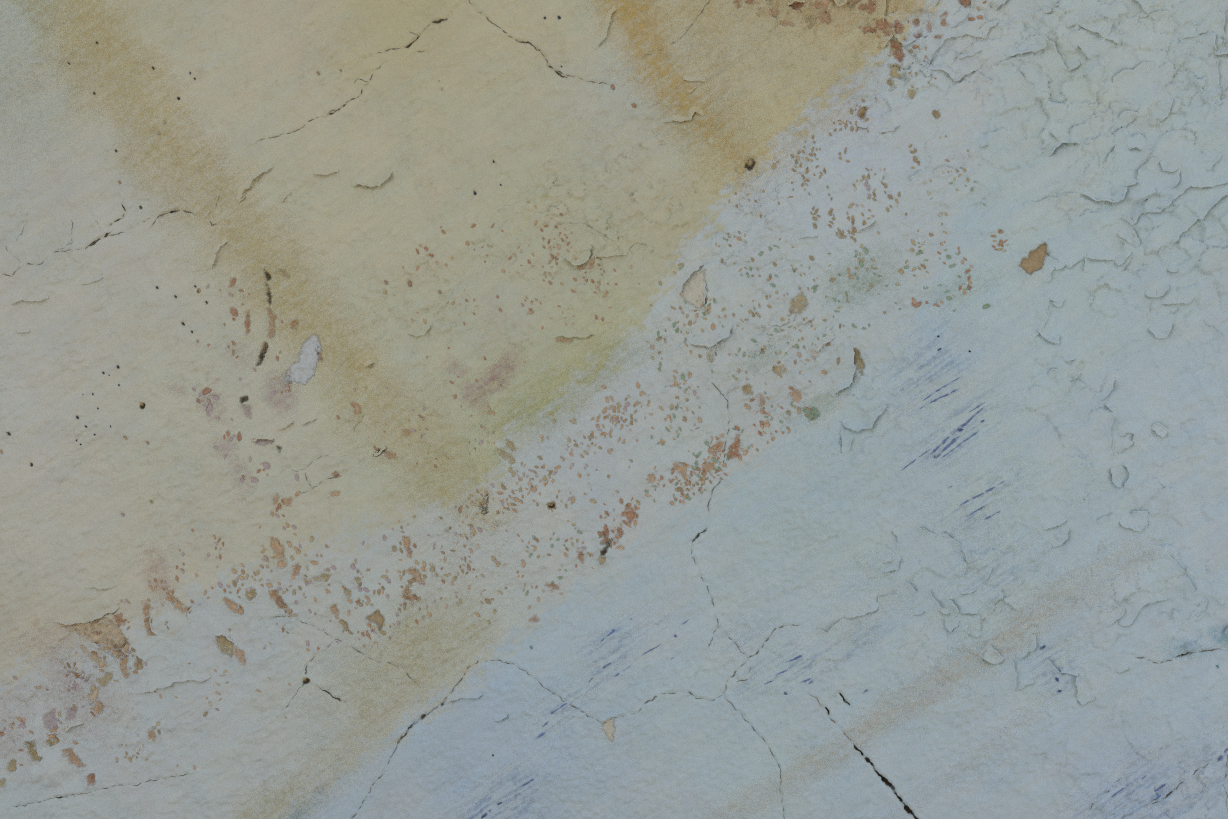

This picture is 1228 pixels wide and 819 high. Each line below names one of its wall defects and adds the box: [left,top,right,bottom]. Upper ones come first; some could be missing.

peeling [735,0,947,98]
peeling [829,97,884,136]
peeling [0,135,973,786]
crack [275,380,798,818]
crack [808,693,918,819]